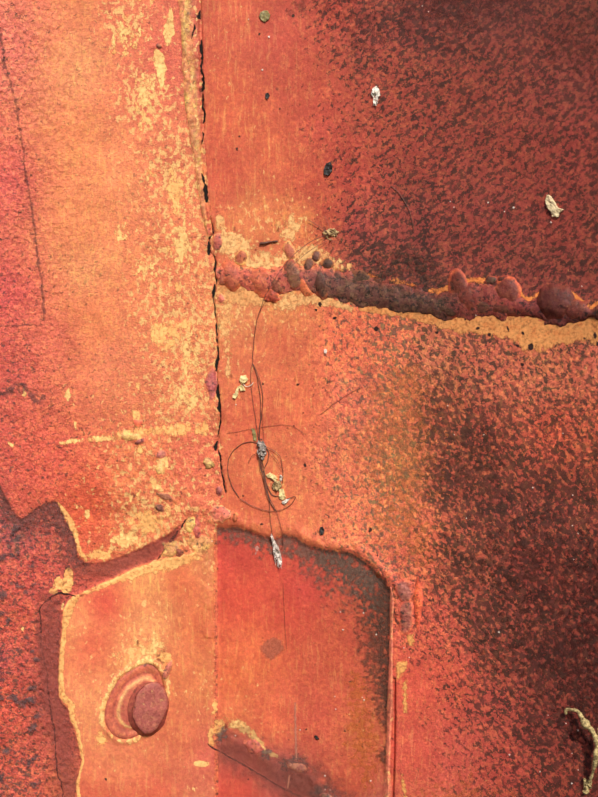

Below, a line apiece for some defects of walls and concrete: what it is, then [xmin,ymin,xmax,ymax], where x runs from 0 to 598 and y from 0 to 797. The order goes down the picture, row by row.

crack [191,10,206,144]
crack [201,173,209,203]
crack [207,224,225,490]
peeling [58,502,180,561]
peeling [49,552,201,797]